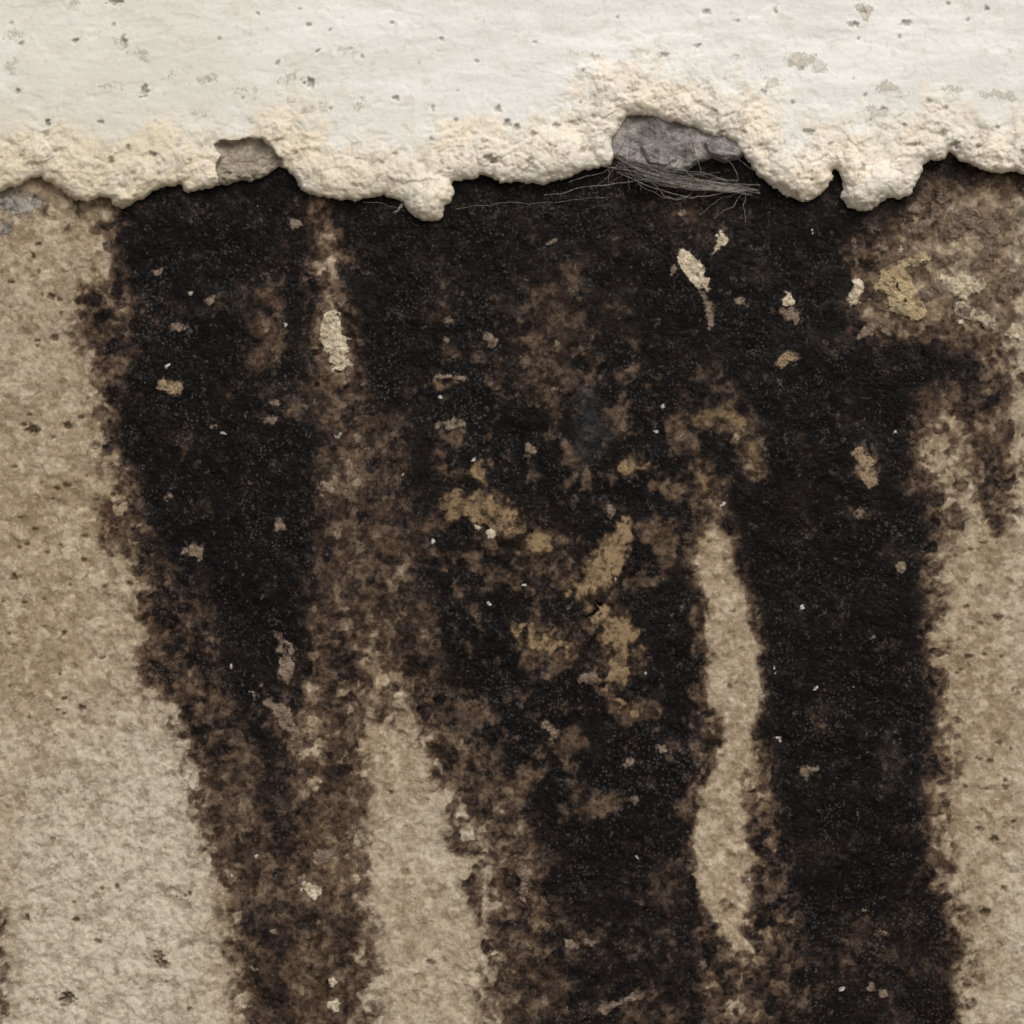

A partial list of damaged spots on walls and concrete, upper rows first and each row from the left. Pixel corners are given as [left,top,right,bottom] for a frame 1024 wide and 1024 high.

spalling [214,137,283,186]
spalling [612,115,744,174]
leakage [66,152,1024,1024]
leakage [0,913,10,1016]